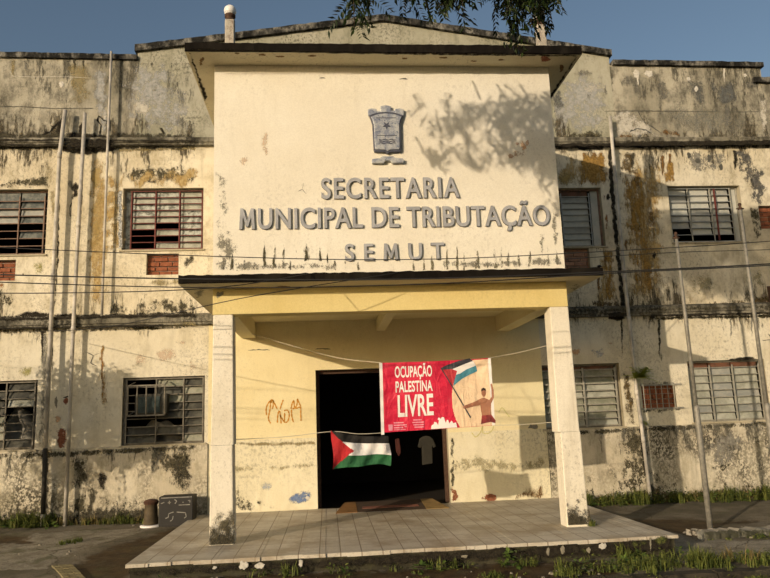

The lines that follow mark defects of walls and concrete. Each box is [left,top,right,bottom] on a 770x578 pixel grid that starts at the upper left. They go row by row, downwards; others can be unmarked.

leakage [0,48,770,361]
corrosion [99,346,107,408]
spalling [54,396,68,448]
leakage [0,297,196,526]
leakage [450,438,543,491]
leakage [580,371,766,501]
mould [209,490,261,545]